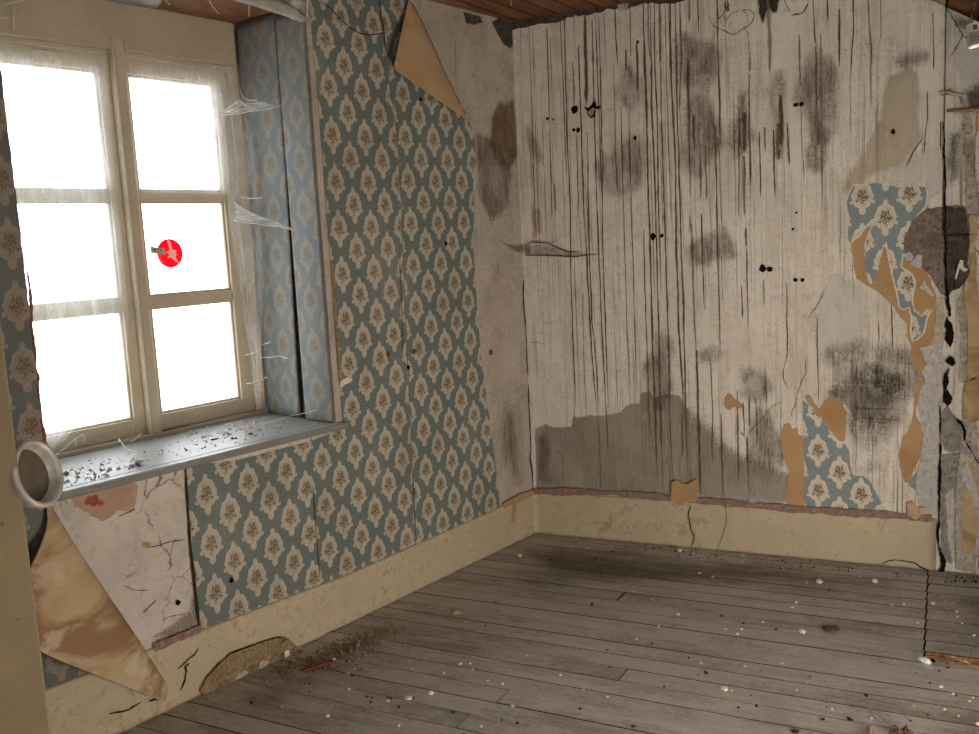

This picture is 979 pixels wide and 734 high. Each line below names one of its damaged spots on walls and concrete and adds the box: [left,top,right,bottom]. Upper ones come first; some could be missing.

water stain [796,0,854,199]
water stain [940,122,960,178]
water stain [532,0,790,504]
water stain [832,305,924,442]
crack [882,121,979,572]
spalling [903,87,979,573]
crack [123,585,186,620]
spalling [199,637,302,695]